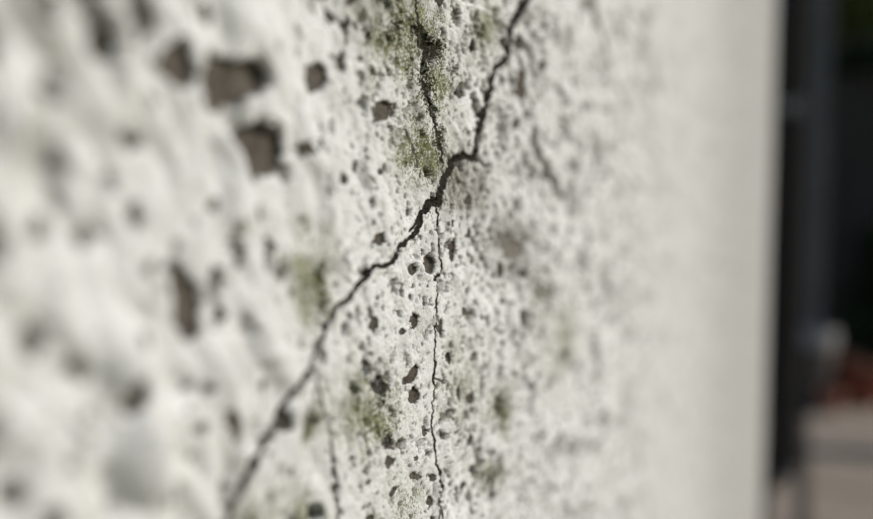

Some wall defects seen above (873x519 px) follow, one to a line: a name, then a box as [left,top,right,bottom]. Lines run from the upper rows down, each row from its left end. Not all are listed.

crack [223,0,530,519]
crack [530,125,565,199]